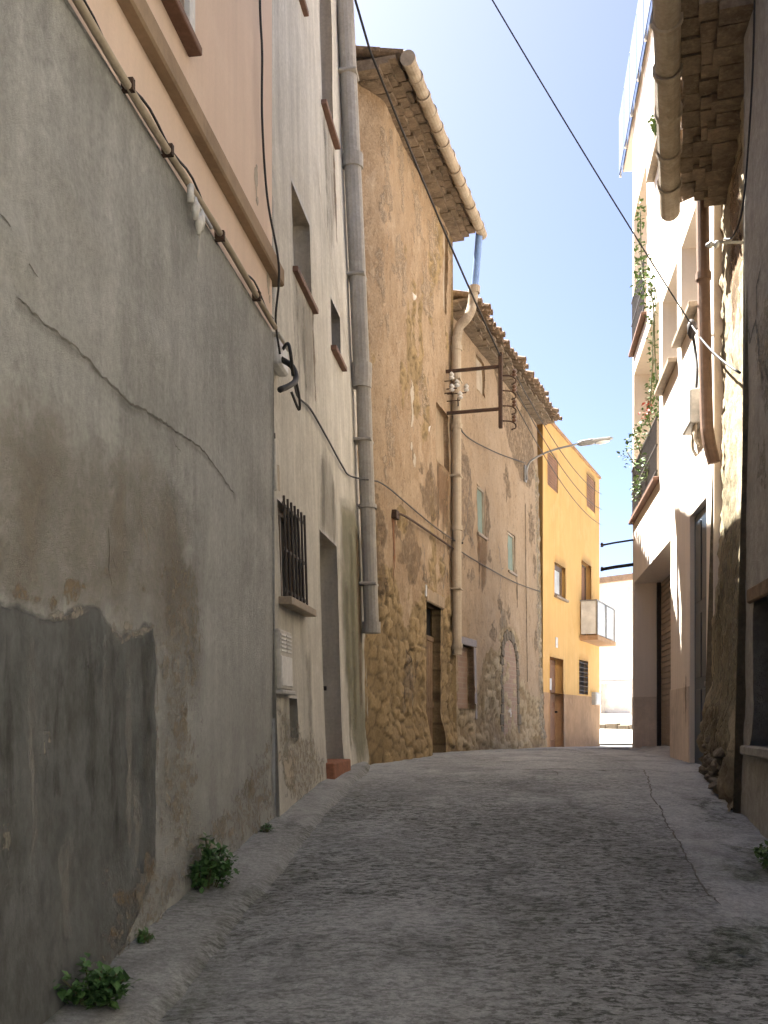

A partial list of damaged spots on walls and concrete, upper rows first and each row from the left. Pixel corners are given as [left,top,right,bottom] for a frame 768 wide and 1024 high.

crack [17,297,234,493]
flaking render [376,506,428,596]
flaking render [461,441,490,543]
flaking render [503,392,547,739]
leakage [0,604,157,1024]
crack [599,769,721,905]